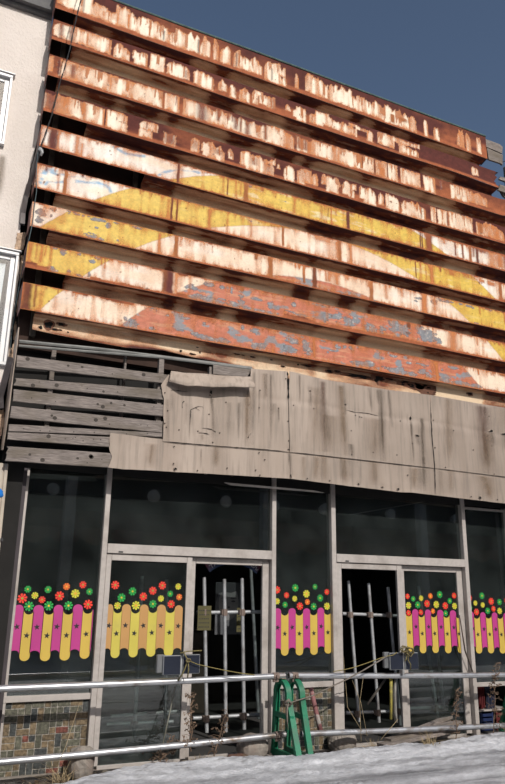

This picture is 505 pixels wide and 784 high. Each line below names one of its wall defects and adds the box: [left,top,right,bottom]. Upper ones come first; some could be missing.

corrosion [20,0,505,408]
peeling [185,282,307,317]
peeling [241,325,267,349]
peeling [283,336,311,356]
peeling [321,312,442,344]
peeling [350,354,482,388]